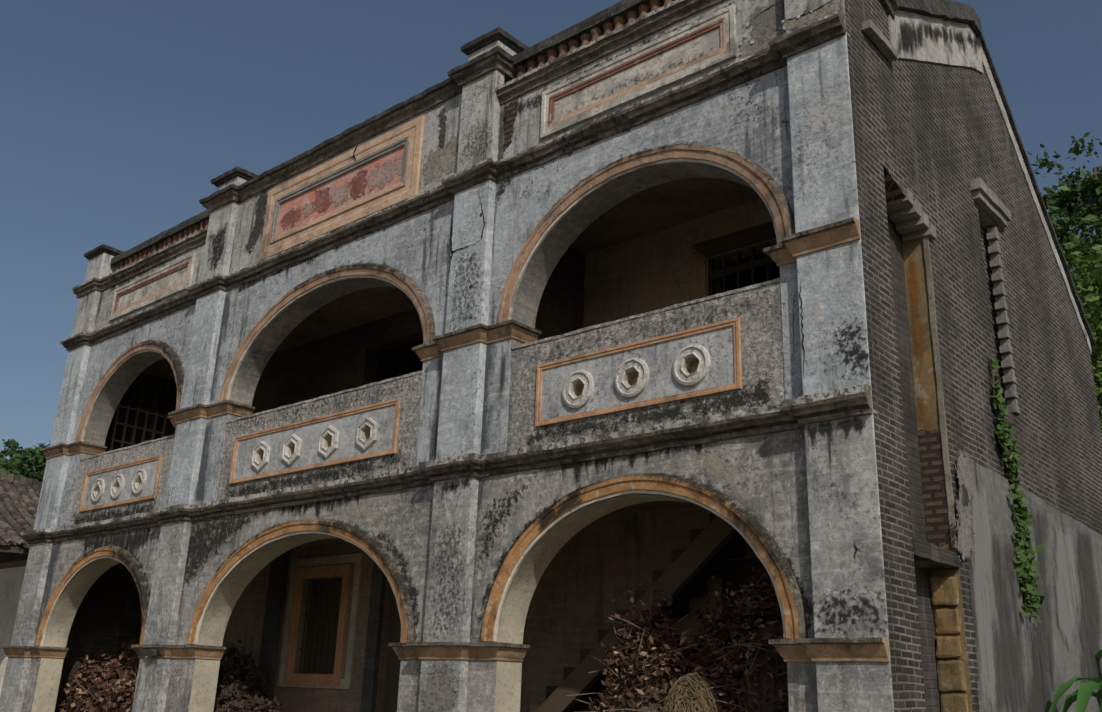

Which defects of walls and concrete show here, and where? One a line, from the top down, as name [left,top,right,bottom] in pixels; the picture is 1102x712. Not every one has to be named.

flaking render [739,0,843,59]
damp [898,20,982,67]
flaking render [503,99,518,151]
damp [208,222,237,270]
crack [449,191,485,288]
damp [96,249,192,316]
crack [791,283,805,370]
damp [527,373,771,446]
damp [807,417,865,461]
mould [228,449,405,498]
damp [179,496,420,640]
damp [441,444,814,635]